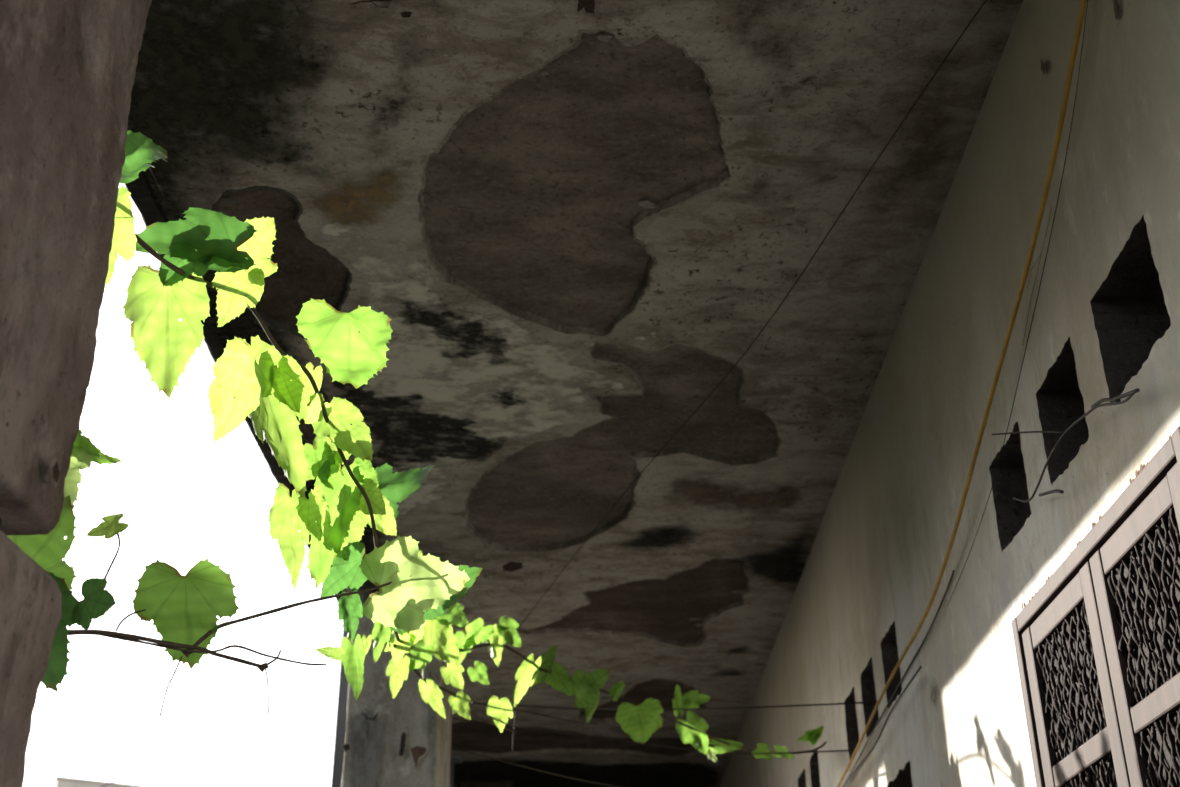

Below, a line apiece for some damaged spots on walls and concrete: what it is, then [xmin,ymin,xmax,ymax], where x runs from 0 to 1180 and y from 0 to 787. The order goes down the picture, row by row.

spalling [575,0,597,15]
damp [127,0,326,222]
damp [202,270,296,358]
spalling [212,186,352,339]
damp [317,172,624,515]
spalling [418,27,782,572]
spalling [296,416,316,445]
damp [285,475,316,499]
damp [359,524,383,555]
damp [623,528,695,548]
damp [359,580,380,597]
spalling [515,558,751,647]